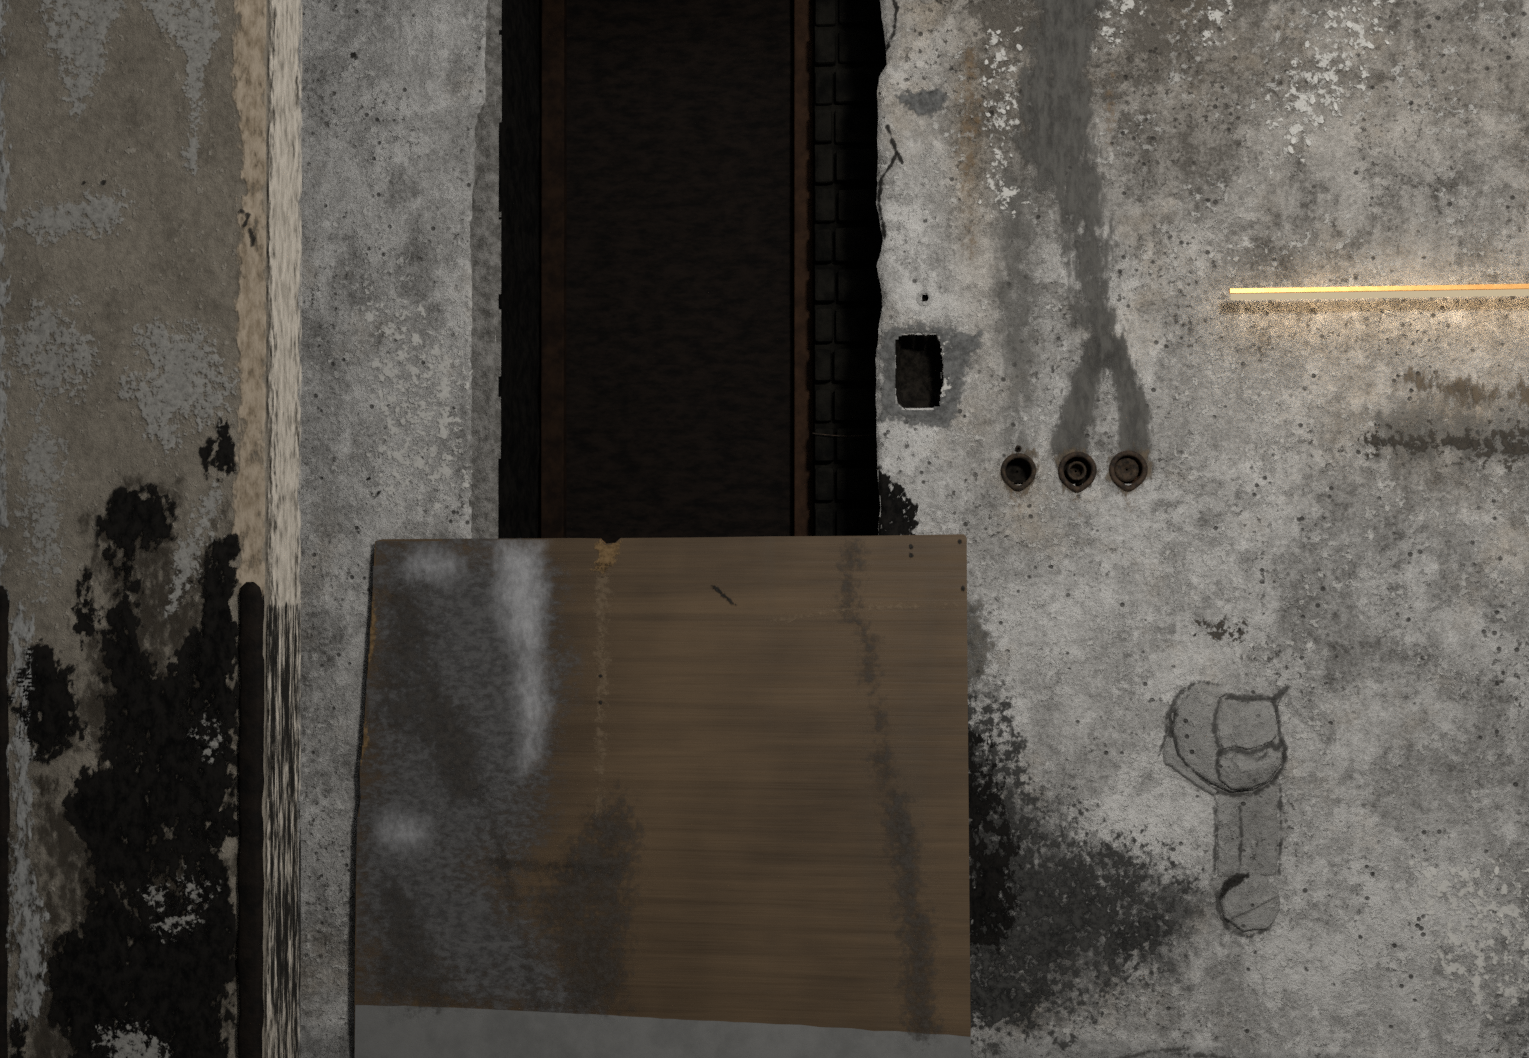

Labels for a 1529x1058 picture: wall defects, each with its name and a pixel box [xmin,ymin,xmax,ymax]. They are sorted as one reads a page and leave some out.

water stain [1002,0,1151,461]
water stain [1353,368,1529,471]
mould [7,417,241,1058]
water stain [967,601,1205,1058]